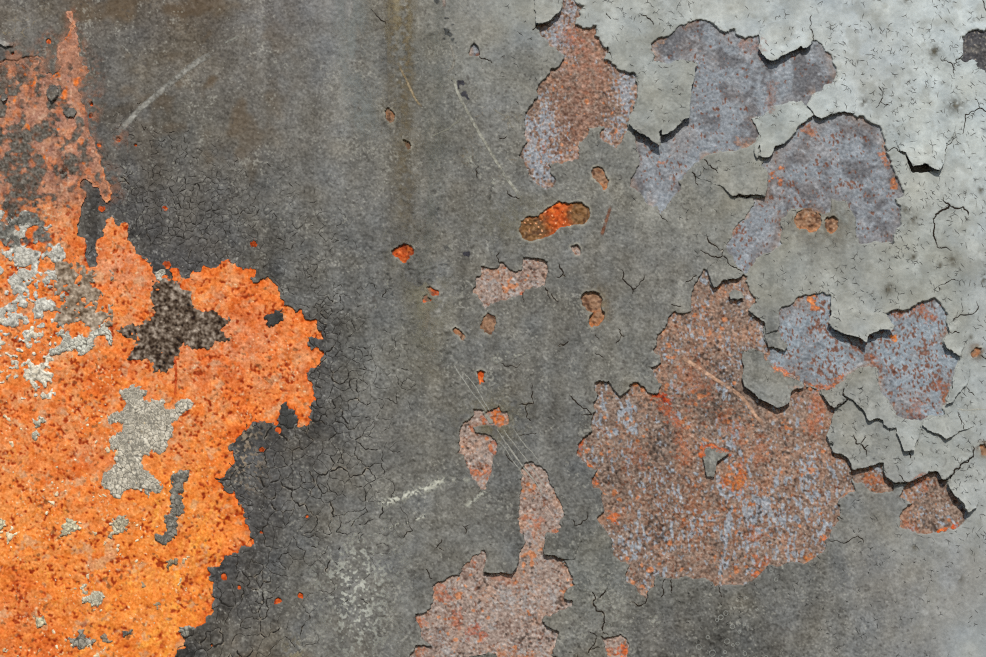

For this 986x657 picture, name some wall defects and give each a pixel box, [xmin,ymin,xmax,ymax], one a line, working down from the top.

rust [0,11,324,657]
crack [79,103,416,657]
peeling [458,407,509,489]
peeling [410,462,582,657]
peeling [473,258,548,335]
peeling [520,0,986,598]